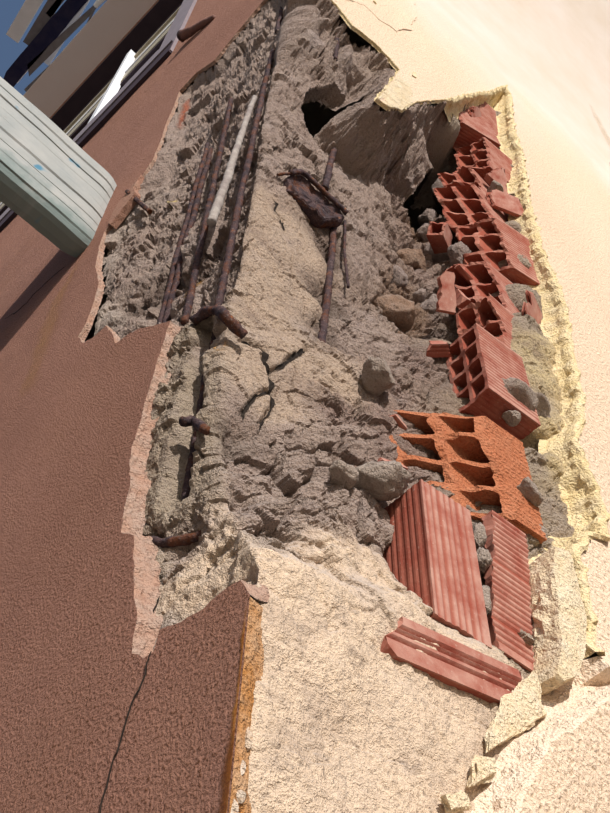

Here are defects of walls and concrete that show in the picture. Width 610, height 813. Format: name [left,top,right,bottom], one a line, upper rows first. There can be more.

crack [99,651,152,813]
crack [240,341,305,433]
spalling [78,0,532,813]
spalling [409,85,610,813]